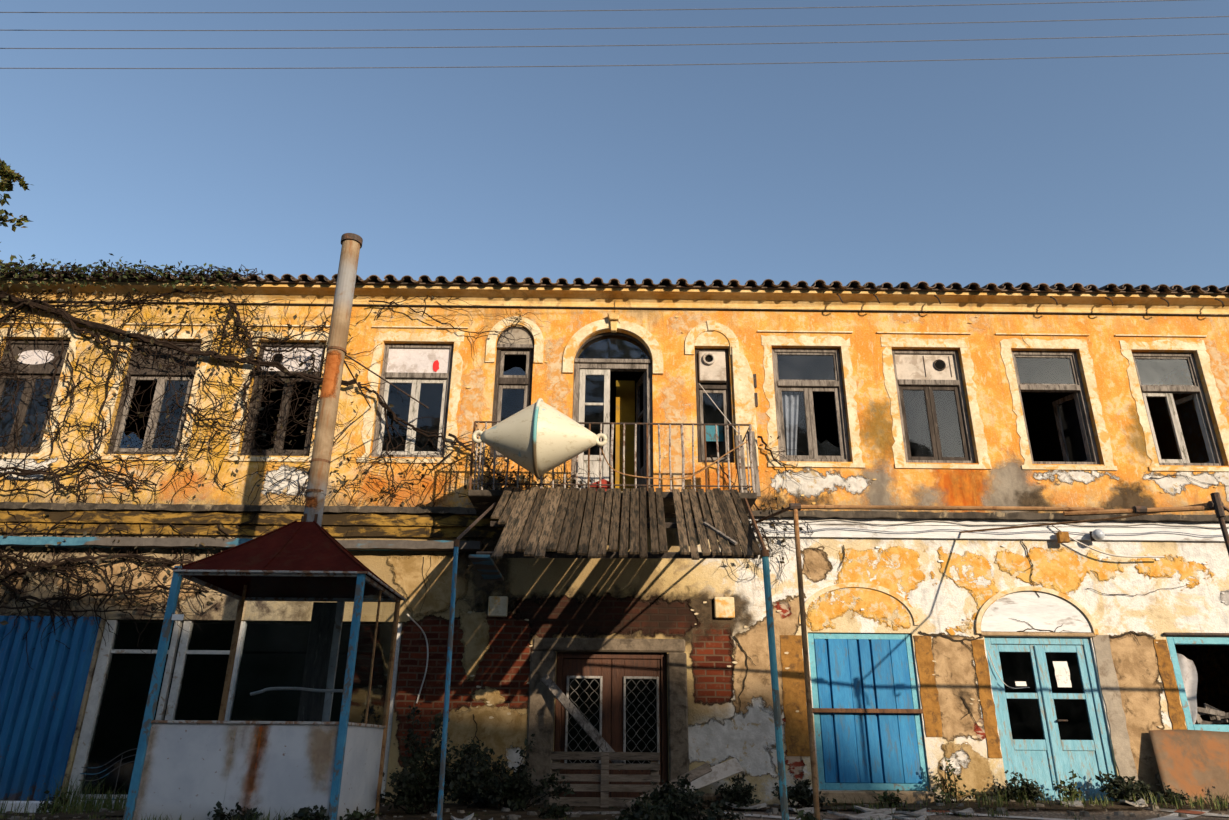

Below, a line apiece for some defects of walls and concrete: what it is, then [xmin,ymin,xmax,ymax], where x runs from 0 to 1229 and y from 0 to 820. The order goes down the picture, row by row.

peeling [256,464,310,501]
peeling [757,467,876,508]
water stain [983,459,1051,513]
peeling [1033,470,1120,485]
water stain [1102,481,1155,510]
peeling [1143,466,1229,502]
crack [420,557,431,611]
peeling [806,544,1214,635]
flaking render [387,552,807,781]
crack [733,636,756,715]
corrosion [244,724,269,792]
peeling [938,691,997,801]